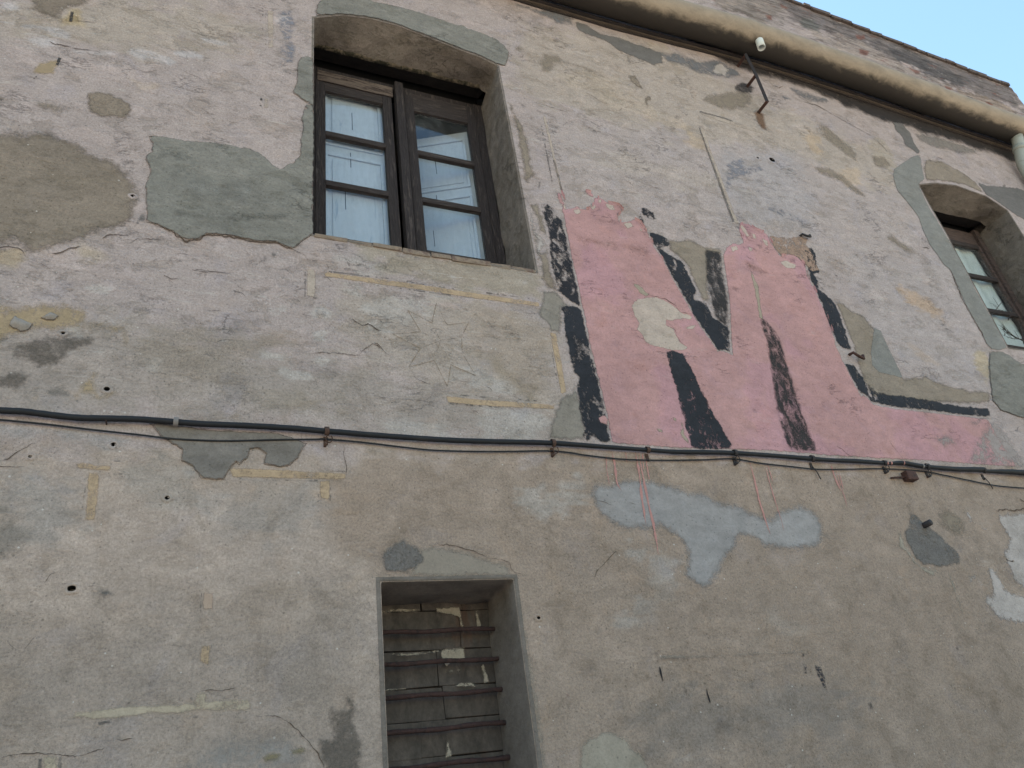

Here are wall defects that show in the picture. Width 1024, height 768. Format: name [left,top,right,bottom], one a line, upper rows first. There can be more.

spalling [88,92,131,117]
rust [736,83,752,93]
spalling [0,133,138,252]
spalling [632,284,696,350]
crack [260,715,324,765]